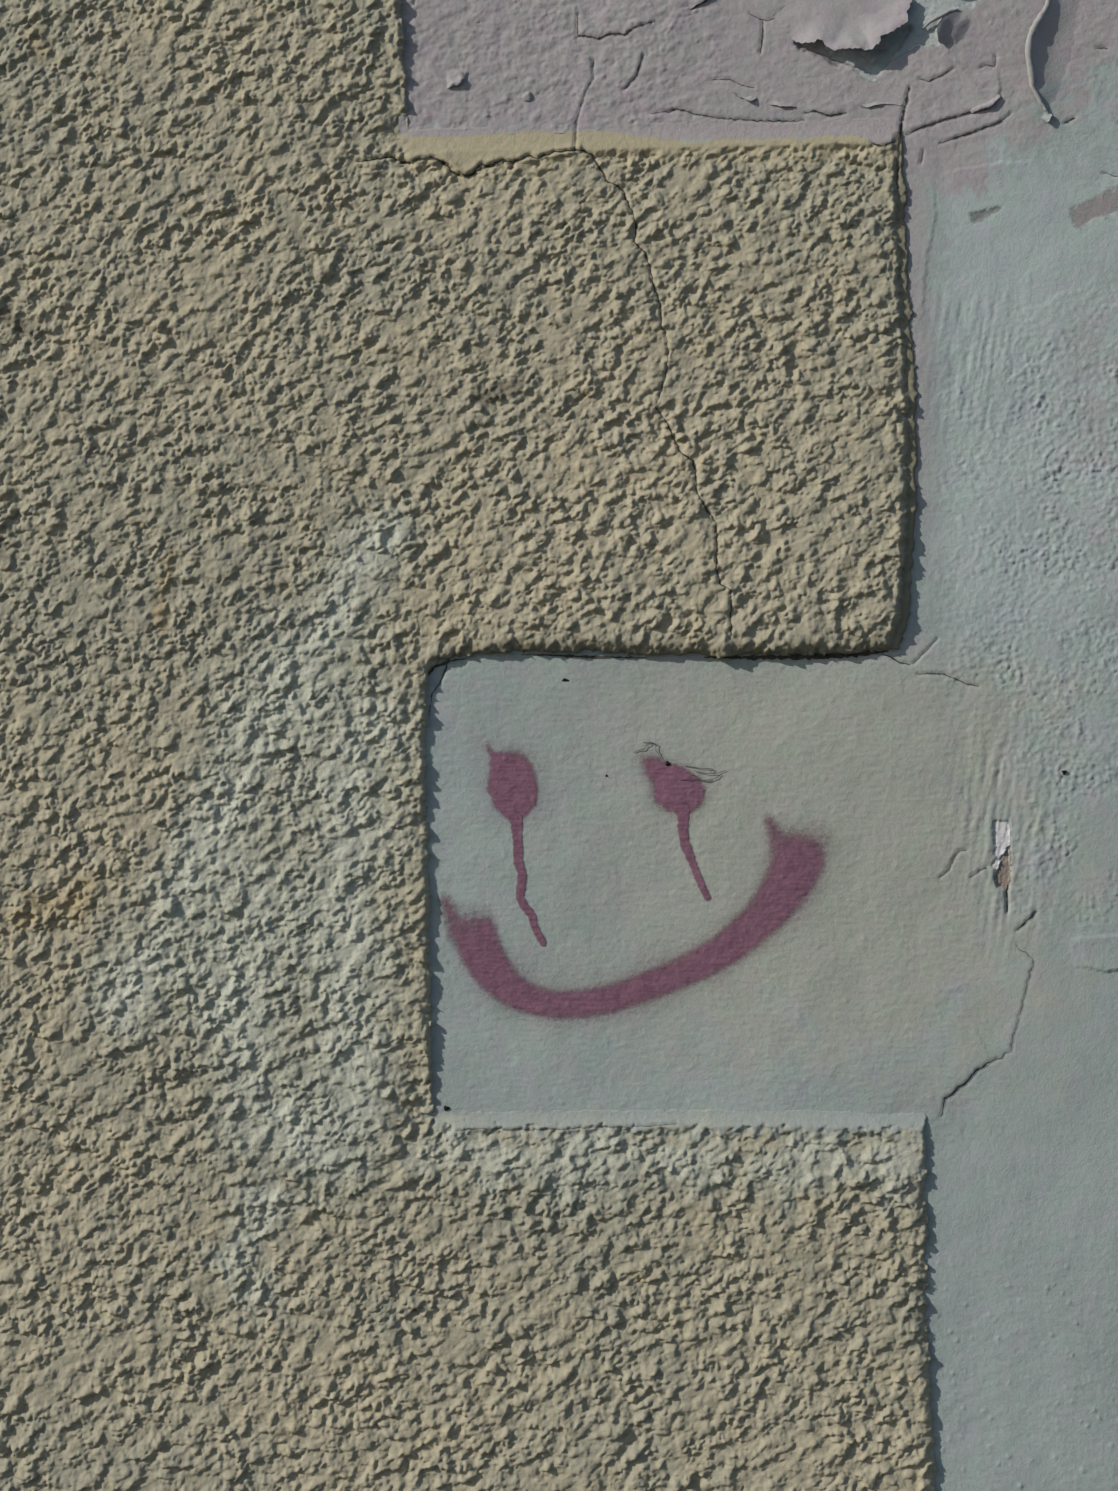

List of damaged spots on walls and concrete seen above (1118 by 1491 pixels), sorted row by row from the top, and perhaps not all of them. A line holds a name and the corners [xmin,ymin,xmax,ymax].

peeling [767,0,980,82]
peeling [1025,0,1080,122]
crack [871,55,1010,188]
peeling [970,93,1000,113]
spalling [971,206,1000,223]
crack [358,13,978,686]
crack [428,658,470,712]
spalling [992,820,1011,888]
crack [940,850,1037,1117]